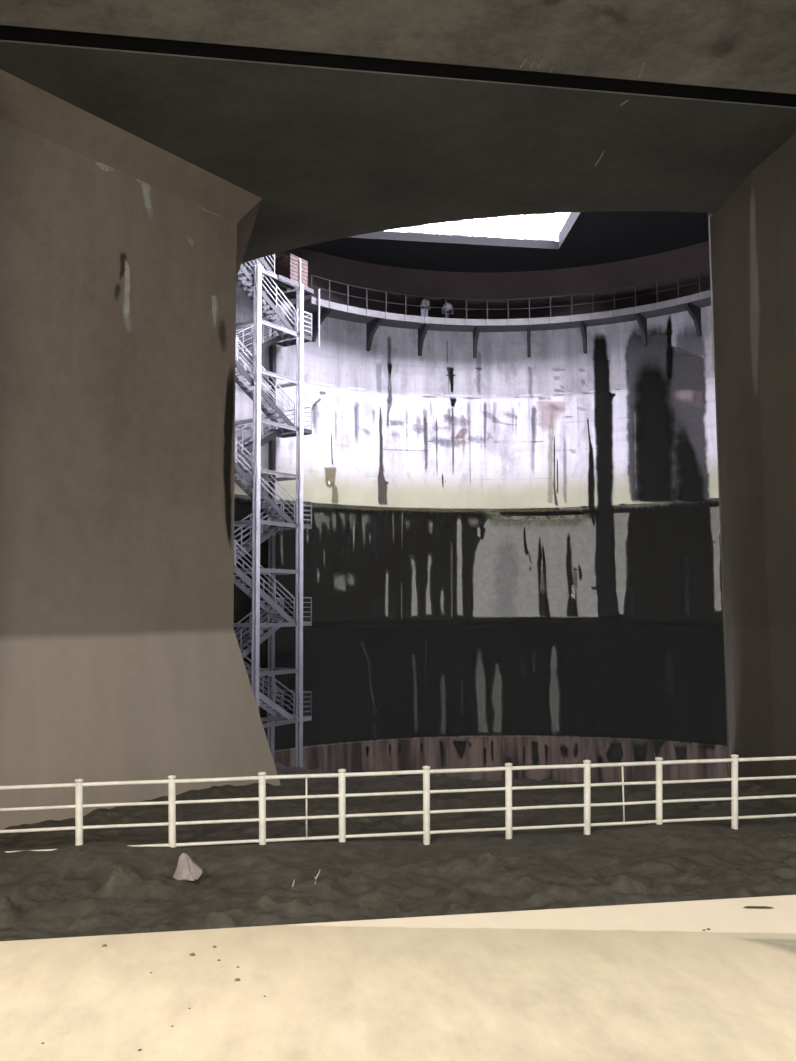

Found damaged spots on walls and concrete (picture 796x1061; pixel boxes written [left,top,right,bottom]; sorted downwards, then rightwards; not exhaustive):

leakage [224,317,728,766]